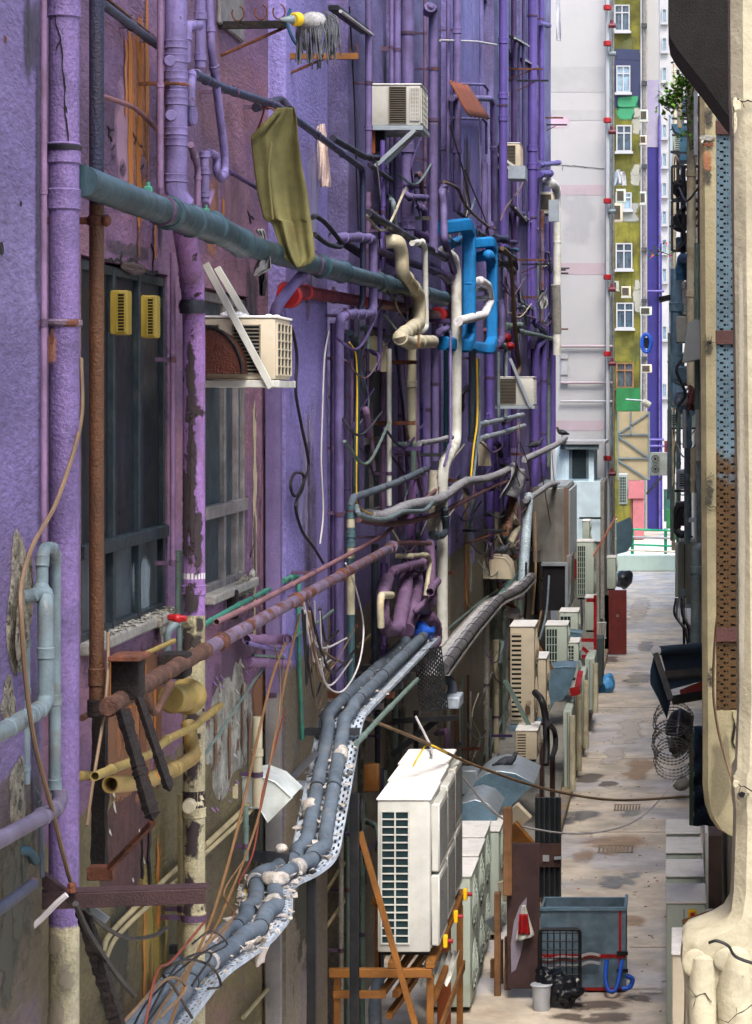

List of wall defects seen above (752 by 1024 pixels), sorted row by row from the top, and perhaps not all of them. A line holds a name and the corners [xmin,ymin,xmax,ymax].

crack [54,6,69,141]
rust [125,0,149,189]
peeling [182,330,204,651]
flaking render [1,529,34,720]
flaking render [9,755,26,824]
flaking render [182,659,253,859]
crack [689,988,752,1023]